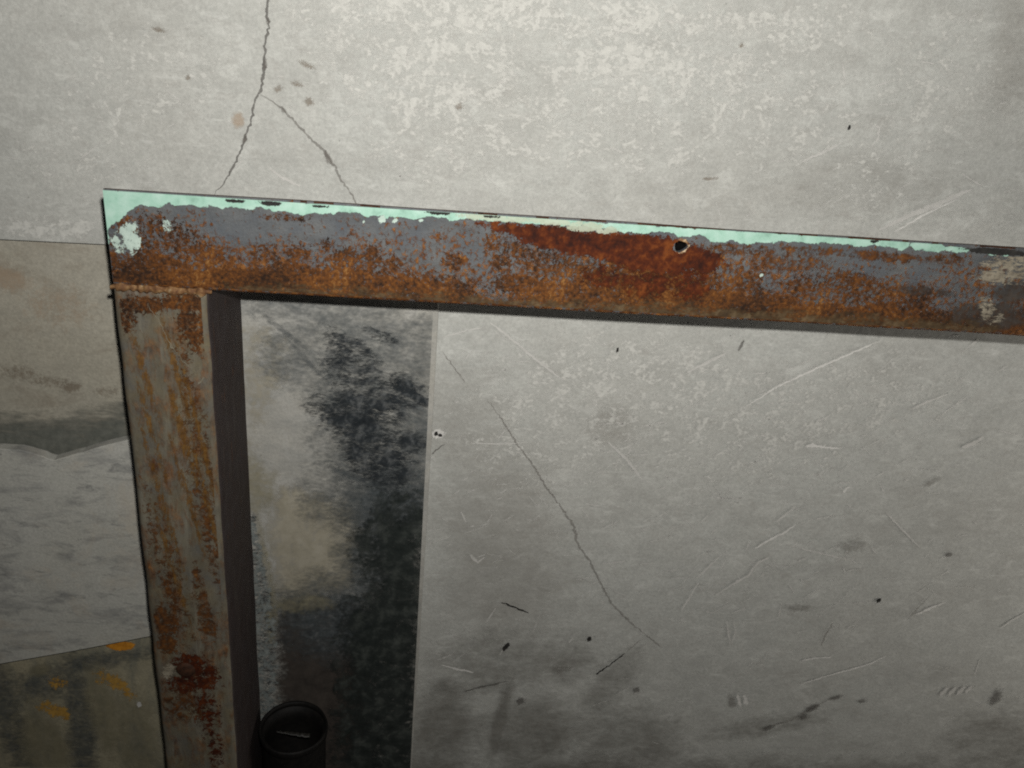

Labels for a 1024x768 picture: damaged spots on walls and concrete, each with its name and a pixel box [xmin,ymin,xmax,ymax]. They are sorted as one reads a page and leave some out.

crack [214,0,270,195]
peeling [103,190,1024,256]
leakage [266,324,429,768]
rust [106,207,1024,767]